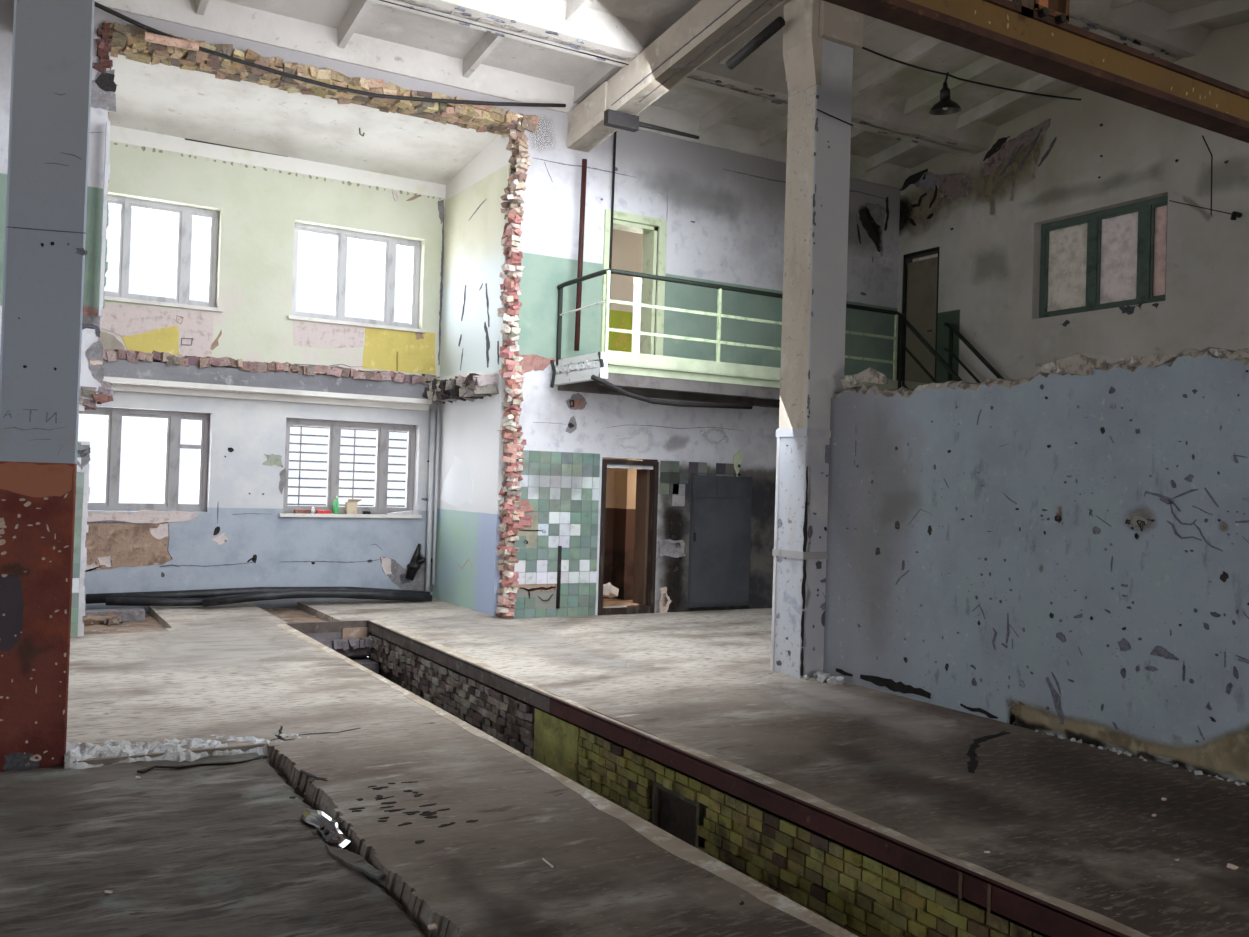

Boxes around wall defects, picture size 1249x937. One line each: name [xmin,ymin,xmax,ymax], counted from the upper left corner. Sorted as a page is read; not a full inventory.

flaking render [897,119,1057,301]
spalling [495,114,556,619]
flaking render [85,510,199,577]
rust [1125,515,1155,539]
crack [1144,488,1223,551]
damp [1150,646,1179,661]
crack [137,726,359,773]
crack [300,770,328,783]
damp [1009,702,1249,785]